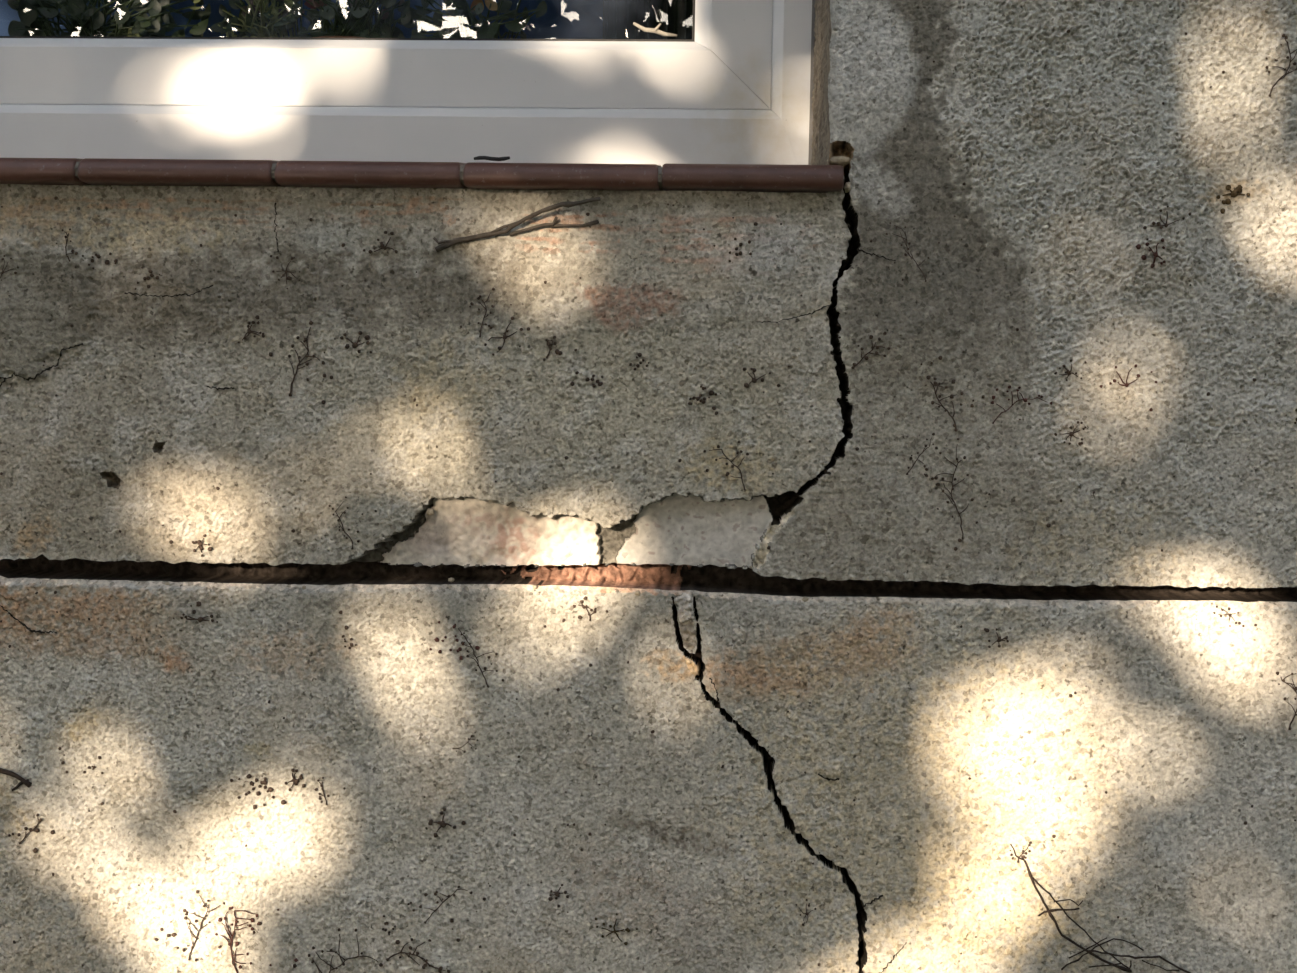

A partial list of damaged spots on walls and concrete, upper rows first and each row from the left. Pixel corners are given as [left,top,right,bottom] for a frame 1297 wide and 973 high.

crack [272,203,280,252]
crack [124,285,213,297]
crack [0,343,83,387]
crack [761,170,896,526]
spalling [347,493,795,591]
crack [0,605,57,634]
crack [671,596,907,973]